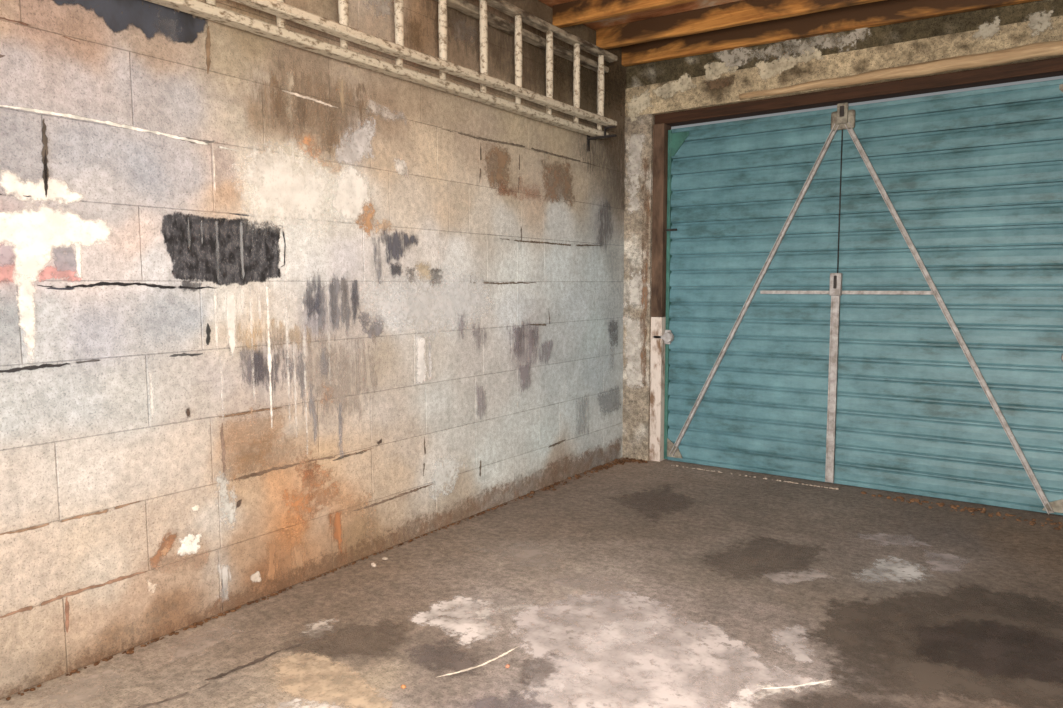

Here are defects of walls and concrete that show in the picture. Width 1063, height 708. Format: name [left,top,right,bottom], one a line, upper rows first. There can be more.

crack [0,118,49,197]
crack [38,282,216,290]
water stain [302,277,359,339]
water stain [240,328,361,439]
rust [268,459,371,580]
water stain [411,575,827,708]